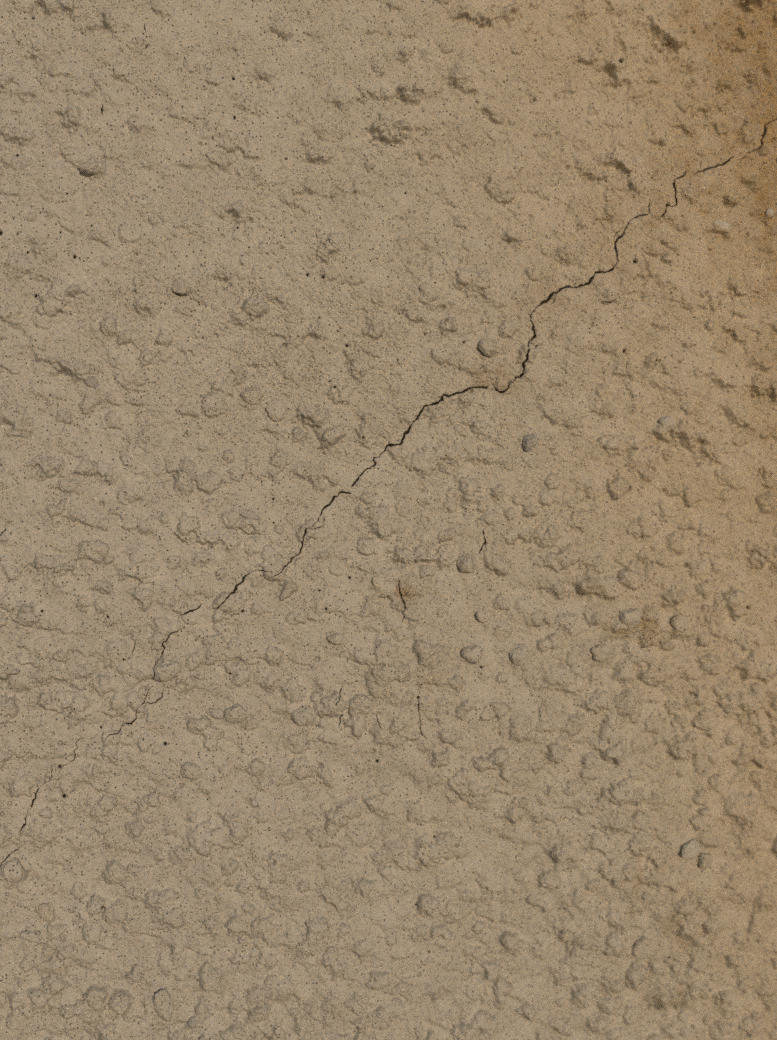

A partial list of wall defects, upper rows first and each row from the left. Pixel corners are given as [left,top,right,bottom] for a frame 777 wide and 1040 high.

crack [0,118,777,867]